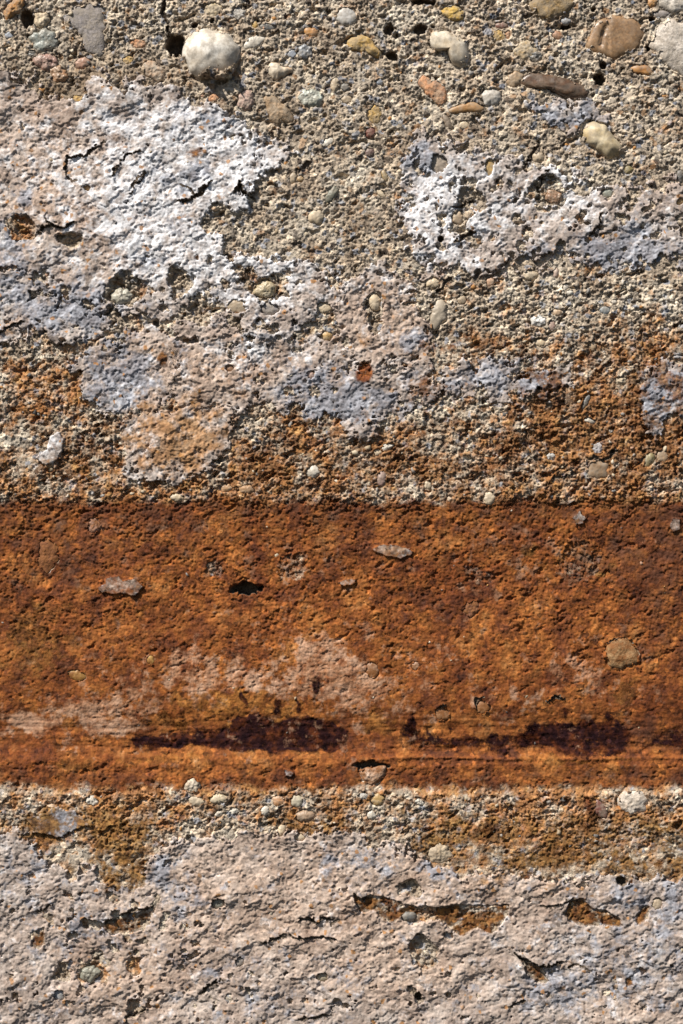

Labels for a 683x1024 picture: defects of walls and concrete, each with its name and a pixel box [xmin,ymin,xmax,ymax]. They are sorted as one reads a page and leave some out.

crack [63,140,146,194]
crack [177,179,256,203]
crack [36,217,76,234]
rust [0,334,683,879]
water stain [131,691,348,754]
water stain [400,707,631,760]
rust [16,804,155,893]
peeling [0,806,683,1024]